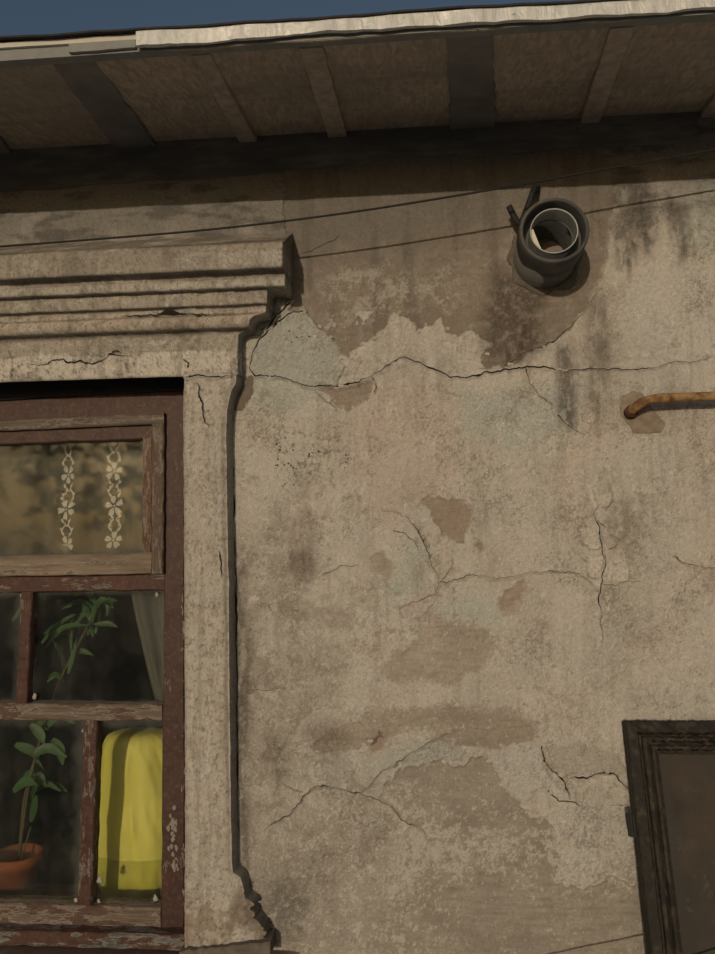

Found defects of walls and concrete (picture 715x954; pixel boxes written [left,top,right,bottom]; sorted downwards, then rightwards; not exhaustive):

peeling [282,147,619,369]
crack [8,350,131,378]
crack [183,281,715,434]
peeling [420,495,484,557]
crack [382,508,641,654]
crack [669,553,715,571]
crack [219,541,462,831]
peeling [309,703,647,954]
crack [541,746,630,807]